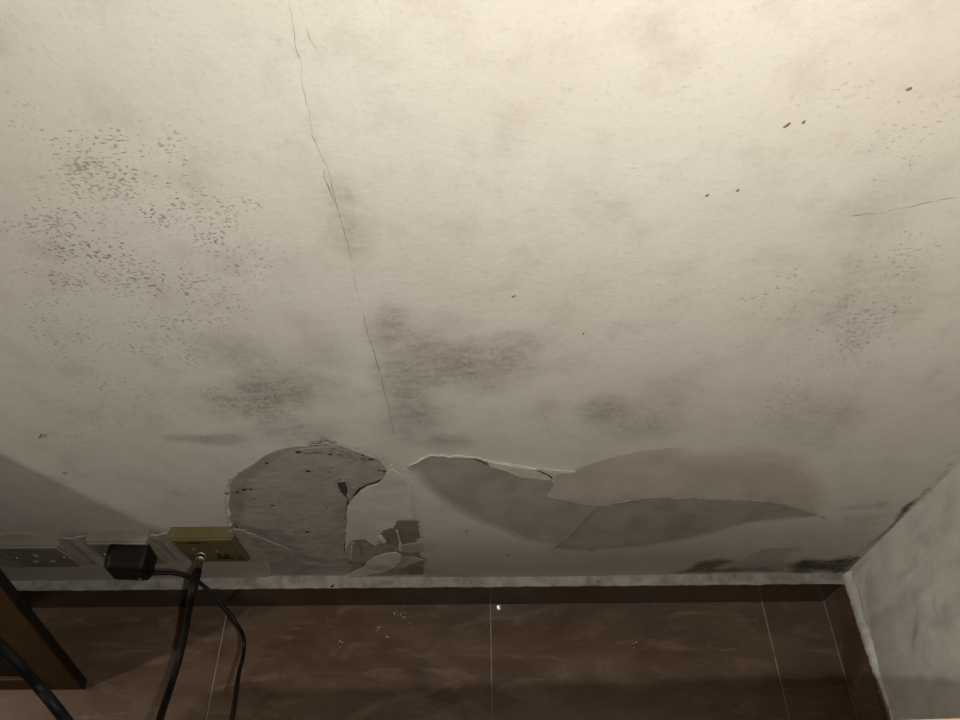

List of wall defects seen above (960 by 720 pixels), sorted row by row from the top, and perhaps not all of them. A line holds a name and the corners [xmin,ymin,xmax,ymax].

peeling [224,441,825,577]
damp [679,550,854,573]